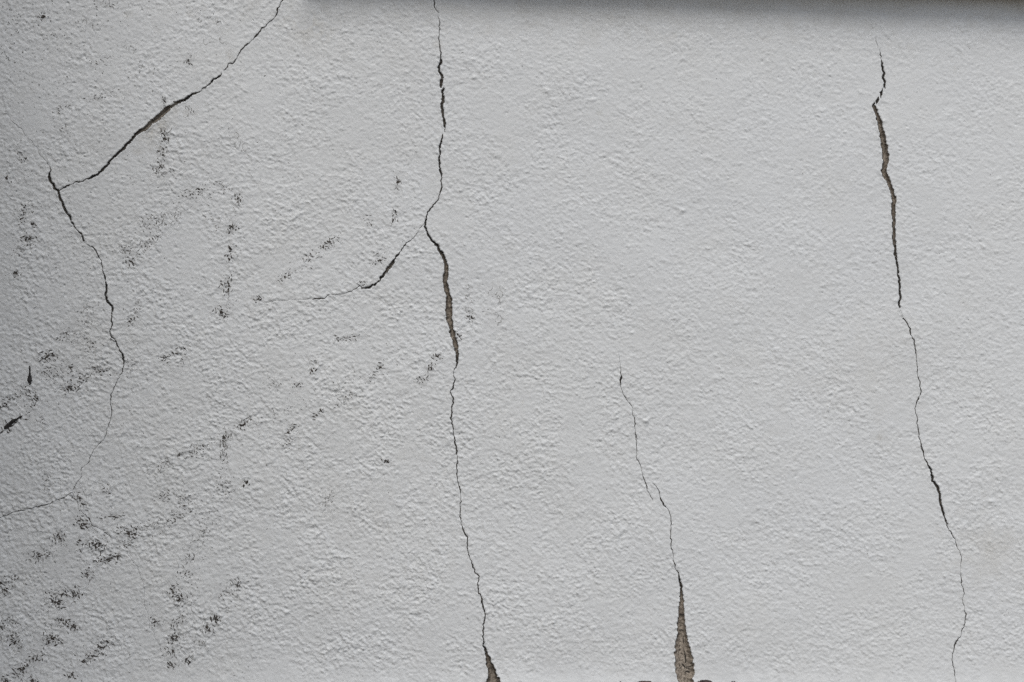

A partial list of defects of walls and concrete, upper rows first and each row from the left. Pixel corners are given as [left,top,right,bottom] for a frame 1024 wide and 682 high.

crack [0,0,283,658]
crack [266,0,500,682]
crack [619,356,695,682]
crack [872,41,967,680]